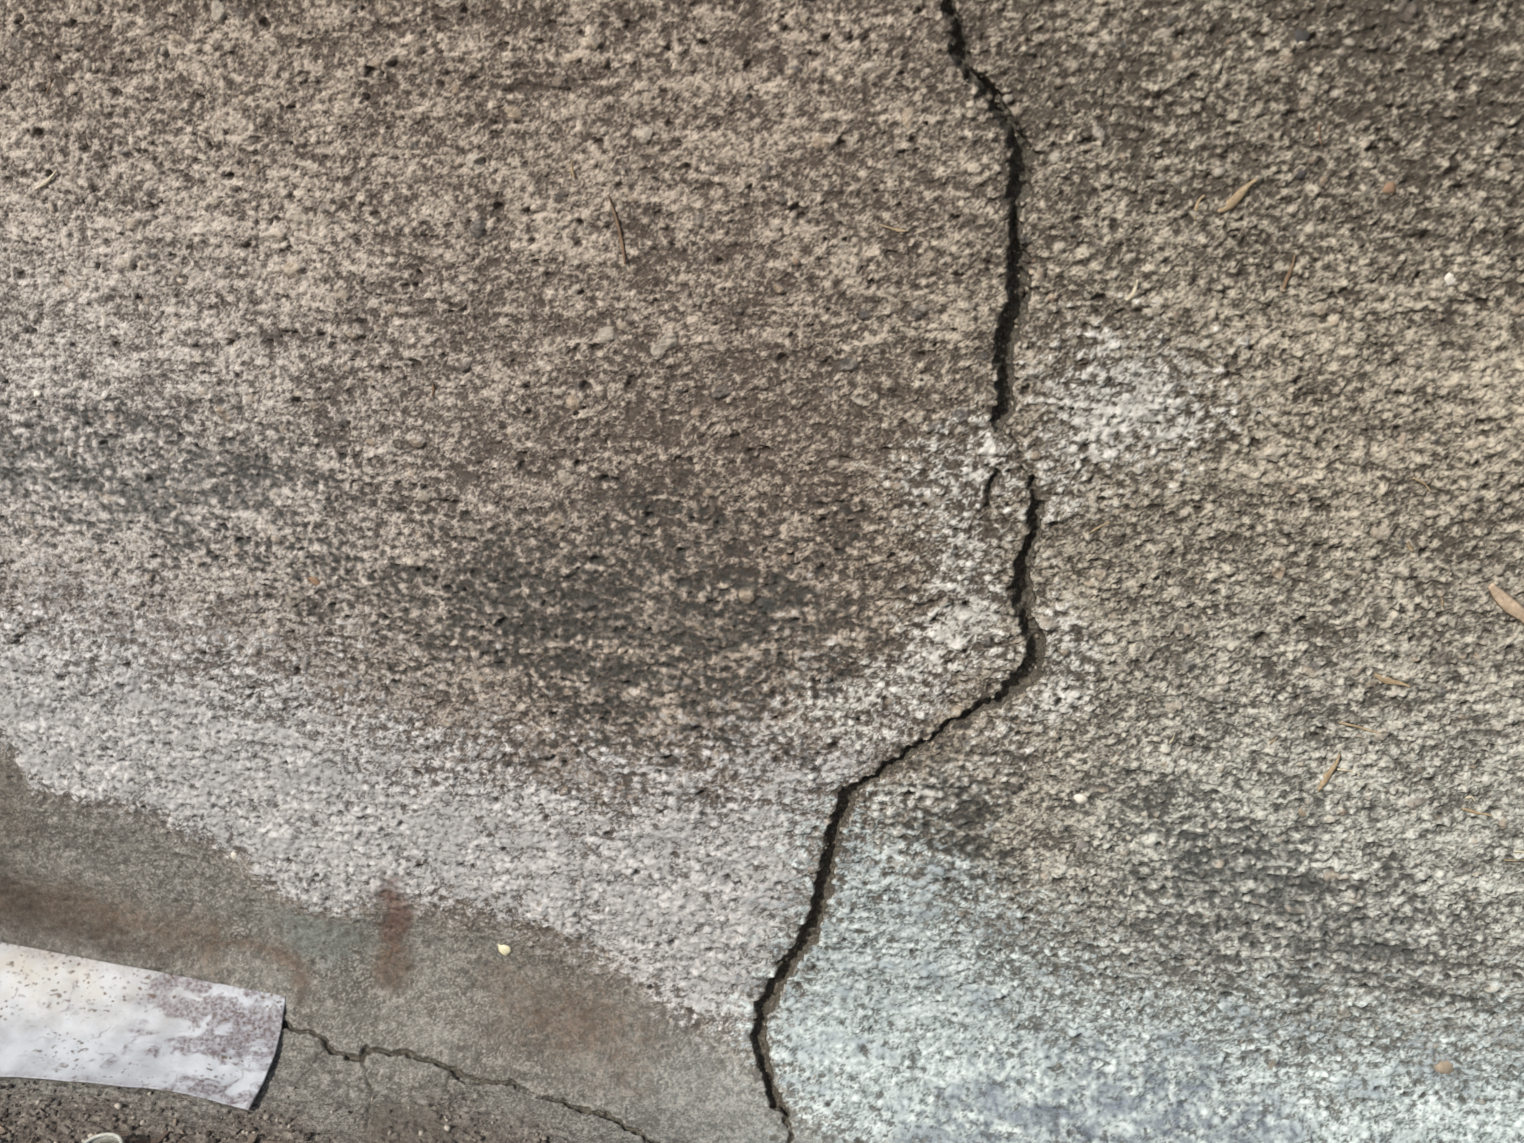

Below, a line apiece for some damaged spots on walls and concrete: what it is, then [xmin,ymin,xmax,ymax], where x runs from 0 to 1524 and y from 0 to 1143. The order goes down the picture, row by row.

crack [282,1021,660,1143]
leakage [0,292,1524,1143]
crack [750,0,1046,1143]